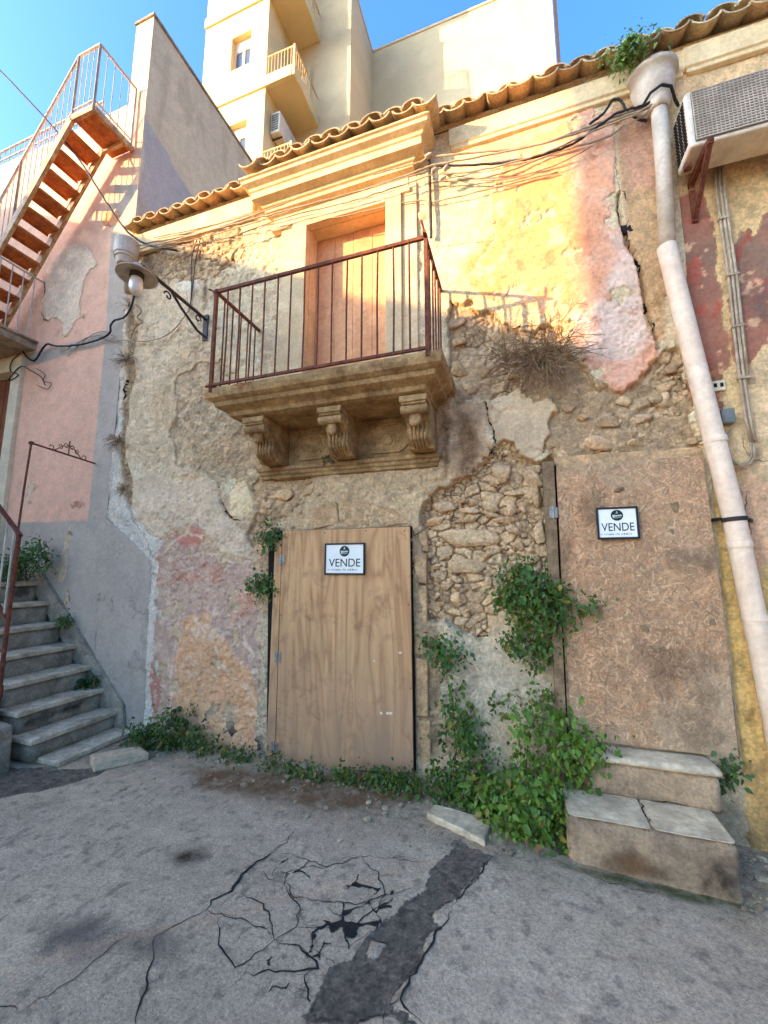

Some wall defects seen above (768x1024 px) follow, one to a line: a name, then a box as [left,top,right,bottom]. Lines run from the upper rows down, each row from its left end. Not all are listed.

peeling [40,243,98,337]
crack [485,402,496,456]
peeling [421,106,701,639]
crack [614,136,657,350]
peeling [679,188,768,409]
peeling [148,519,262,751]
crack [0,830,419,1024]